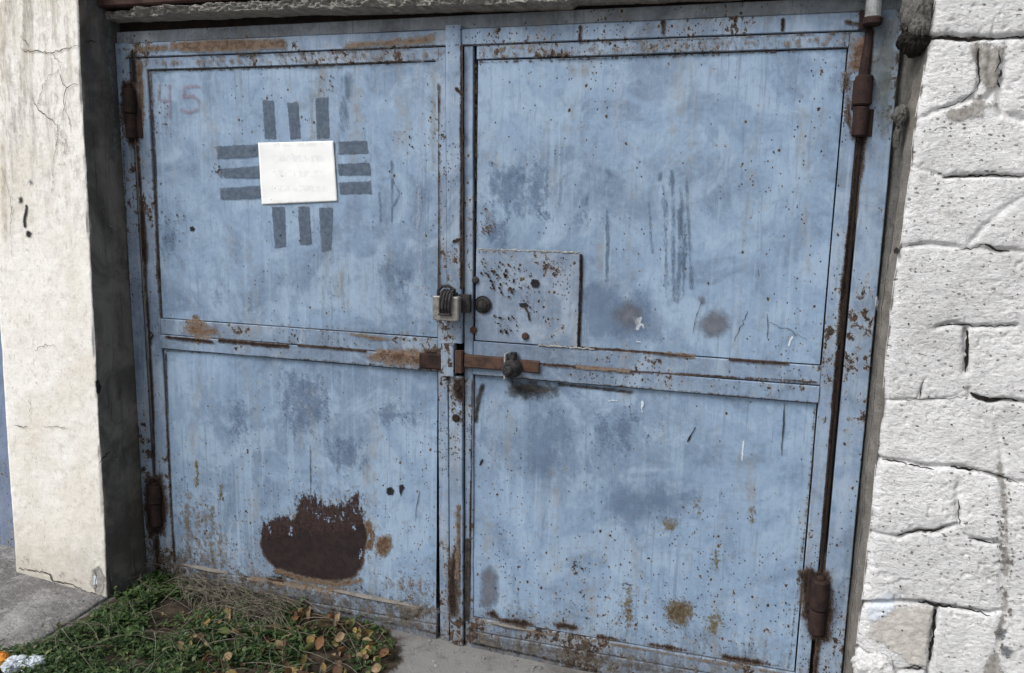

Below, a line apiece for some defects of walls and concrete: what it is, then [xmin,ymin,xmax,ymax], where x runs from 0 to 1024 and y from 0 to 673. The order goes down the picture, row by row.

crack [21,36,94,163]
rust [120,18,874,673]